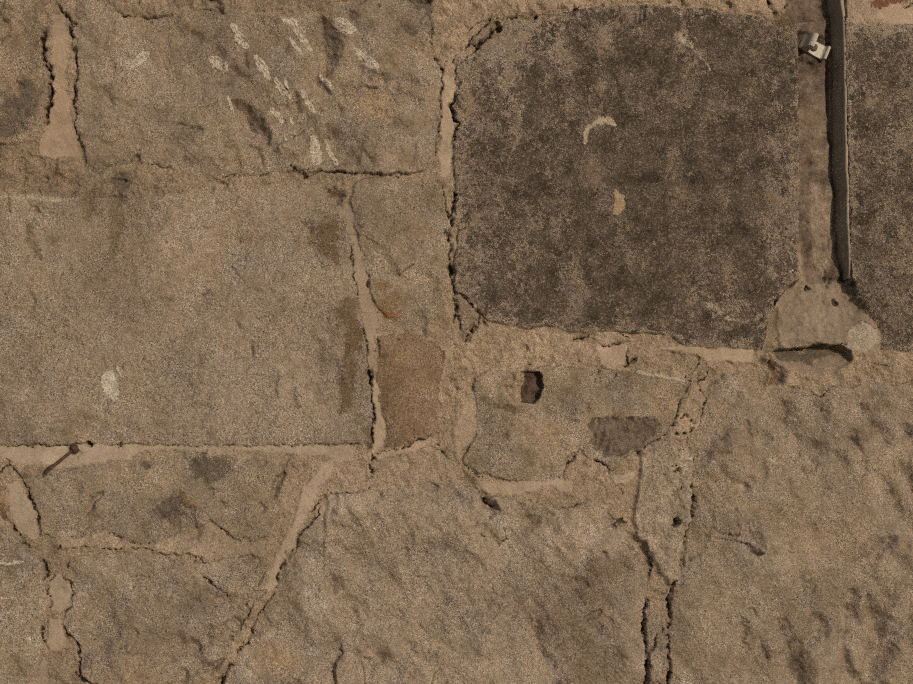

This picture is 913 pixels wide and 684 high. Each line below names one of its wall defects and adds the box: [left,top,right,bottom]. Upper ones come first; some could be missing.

crack [1,327,492,684]
crack [637,354,708,684]